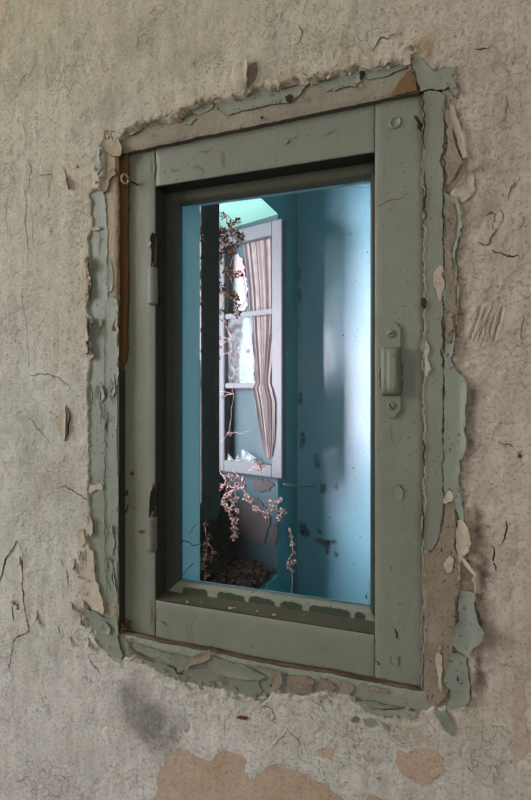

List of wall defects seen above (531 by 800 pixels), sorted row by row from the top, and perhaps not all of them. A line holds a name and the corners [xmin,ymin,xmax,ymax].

crack [478,177,524,257]
peeling [67,45,489,736]
crack [0,541,29,668]
peeling [154,749,343,800]
peeling [395,749,444,786]